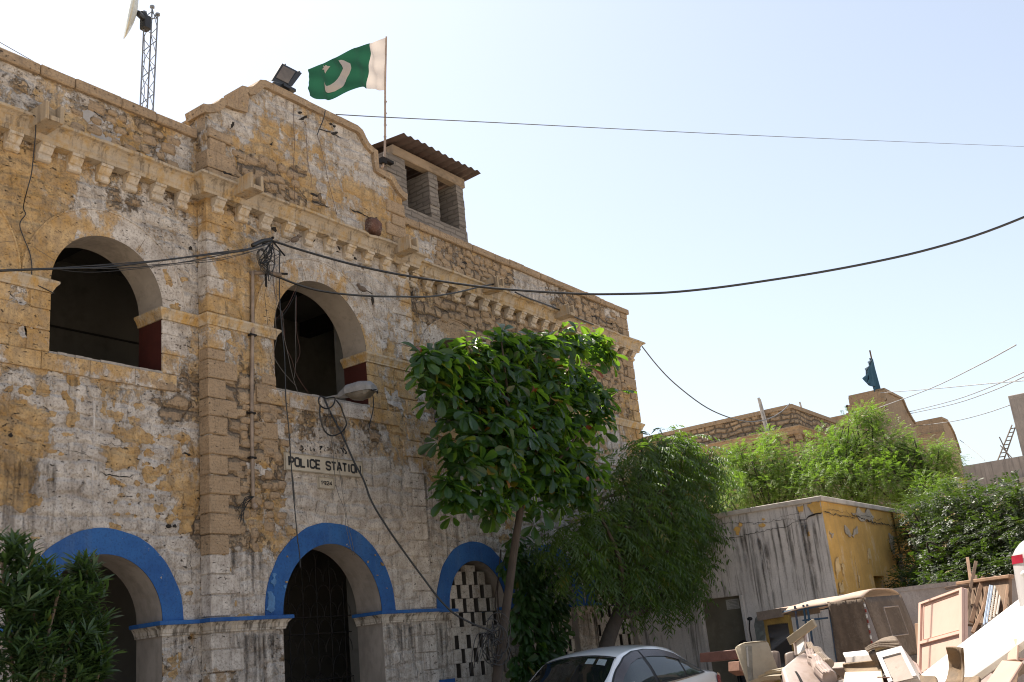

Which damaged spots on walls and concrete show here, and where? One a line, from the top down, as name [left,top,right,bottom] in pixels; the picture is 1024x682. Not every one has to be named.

spalling [227,117,358,206]
peeling [0,367,84,513]
peeling [97,385,197,535]
peeling [261,419,294,439]